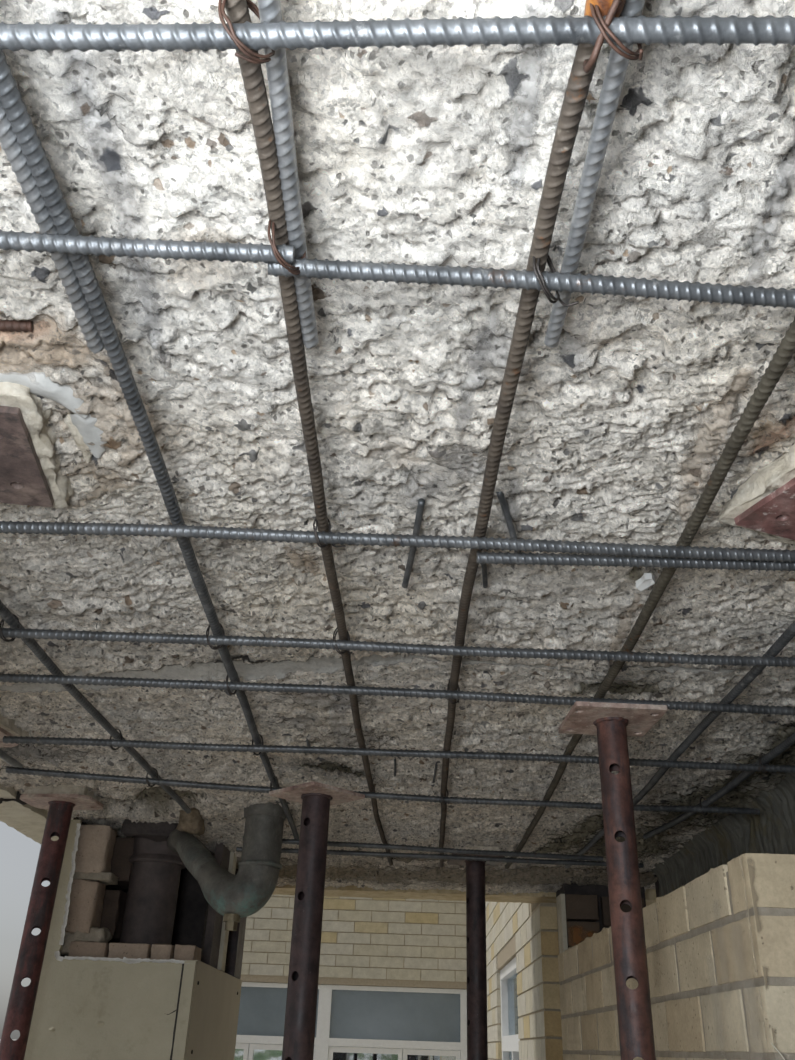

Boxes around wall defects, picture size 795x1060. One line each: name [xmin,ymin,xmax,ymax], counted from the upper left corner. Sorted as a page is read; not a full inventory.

corrosion [583,0,626,73]
corrosion [0,324,67,363]
spalling [628,567,655,591]
spalling [0,653,567,693]